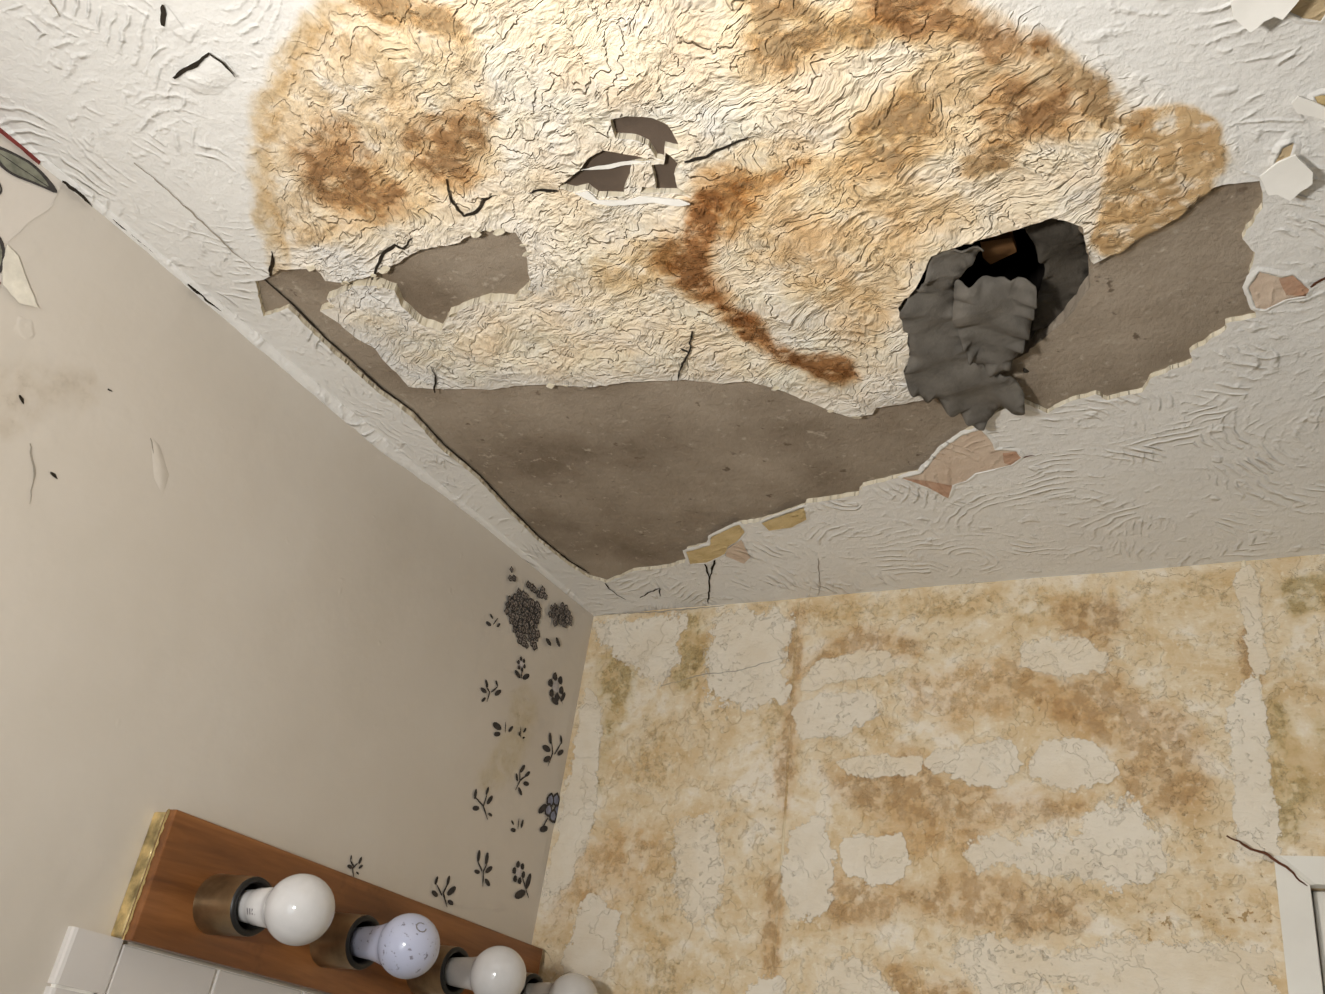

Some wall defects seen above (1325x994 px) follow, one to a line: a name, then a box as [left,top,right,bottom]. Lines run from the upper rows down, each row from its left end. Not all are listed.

damp [365,0,461,33]
damp [753,0,835,69]
peeling [1230,0,1325,33]
damp [1036,46,1144,129]
peeling [1291,88,1325,123]
flaking render [557,116,691,206]
damp [966,144,1014,175]
spalling [952,227,1045,298]
flaking render [999,136,1315,413]
crack [677,331,693,381]
flaking render [255,228,1025,583]
crack [1226,835,1307,886]